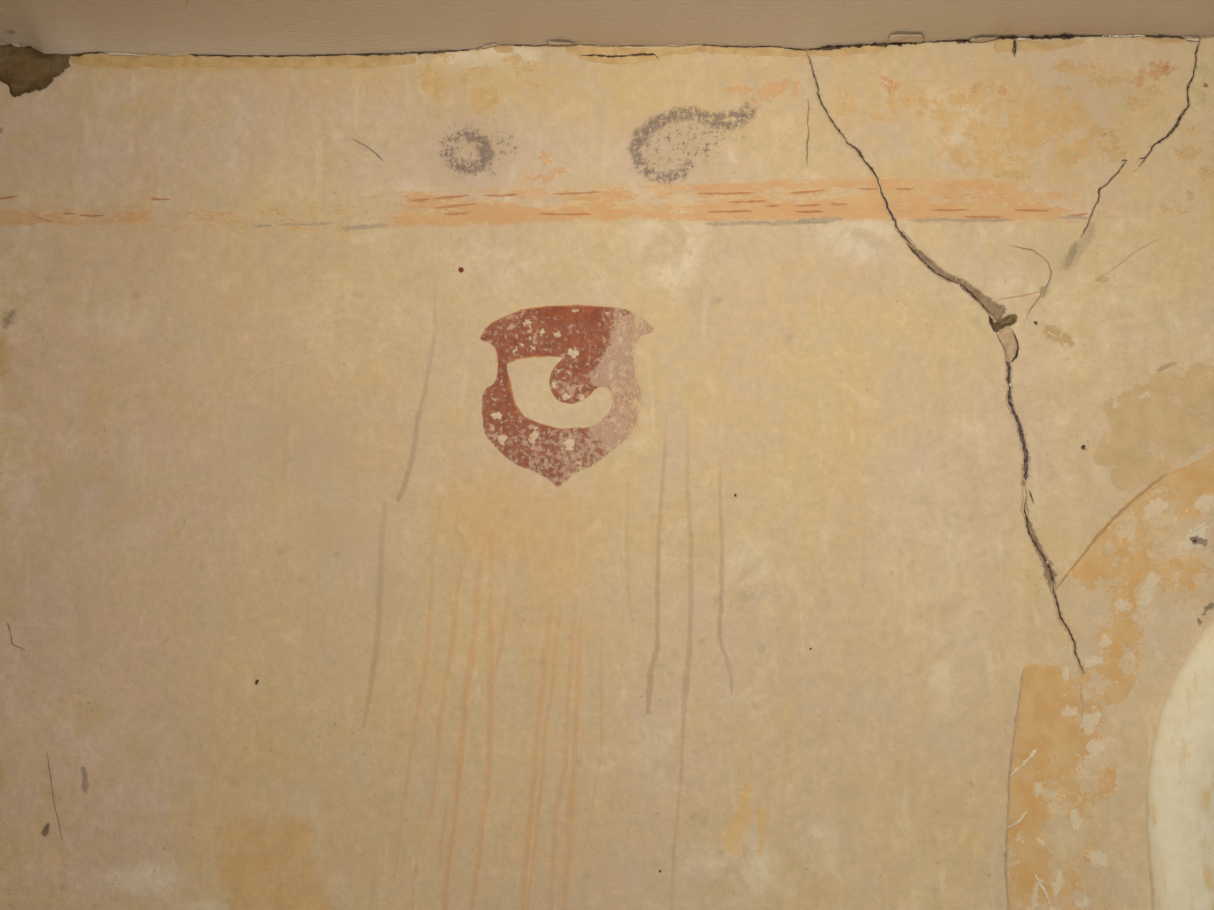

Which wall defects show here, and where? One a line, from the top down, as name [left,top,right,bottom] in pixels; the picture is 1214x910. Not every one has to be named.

crack [69,33,1214,723]
spalling [1190,535,1208,546]